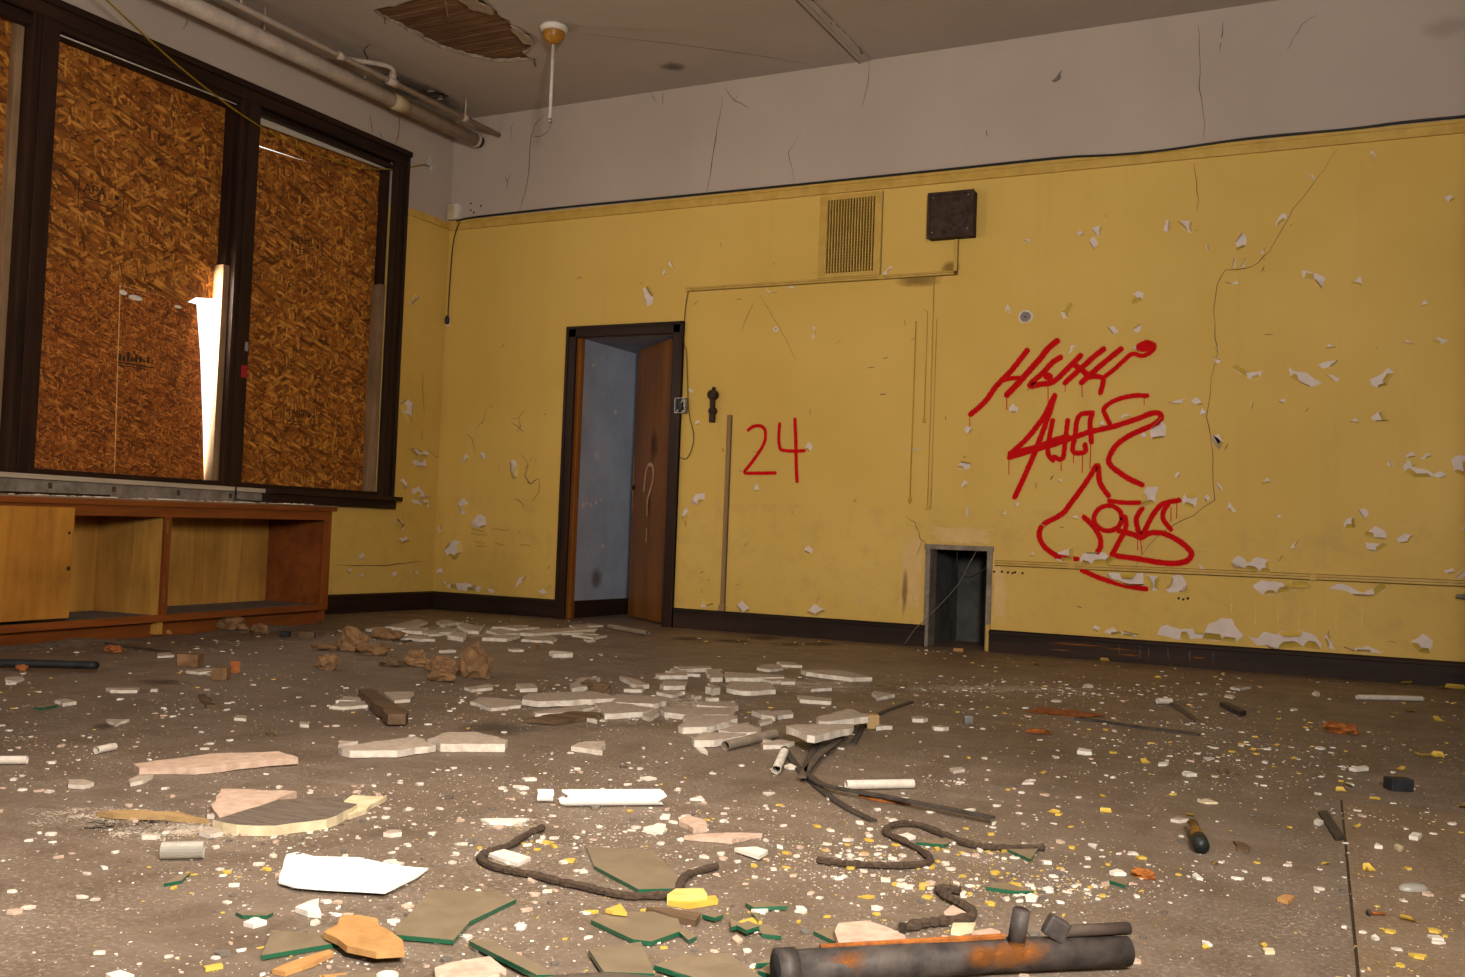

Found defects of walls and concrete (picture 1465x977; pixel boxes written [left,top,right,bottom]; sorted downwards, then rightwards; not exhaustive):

spalling [373,0,537,66]
crack [1194,26,1223,208]
spalling [1005,304,1033,323]
crack [1136,151,1336,565]
peeling [1289,344,1339,387]
peeling [1370,367,1395,388]
peeling [1141,397,1207,439]
peeling [1174,472,1236,512]
peeling [1344,508,1414,551]
peeling [437,524,494,593]
peeling [1057,547,1187,593]
peeling [1231,556,1386,596]